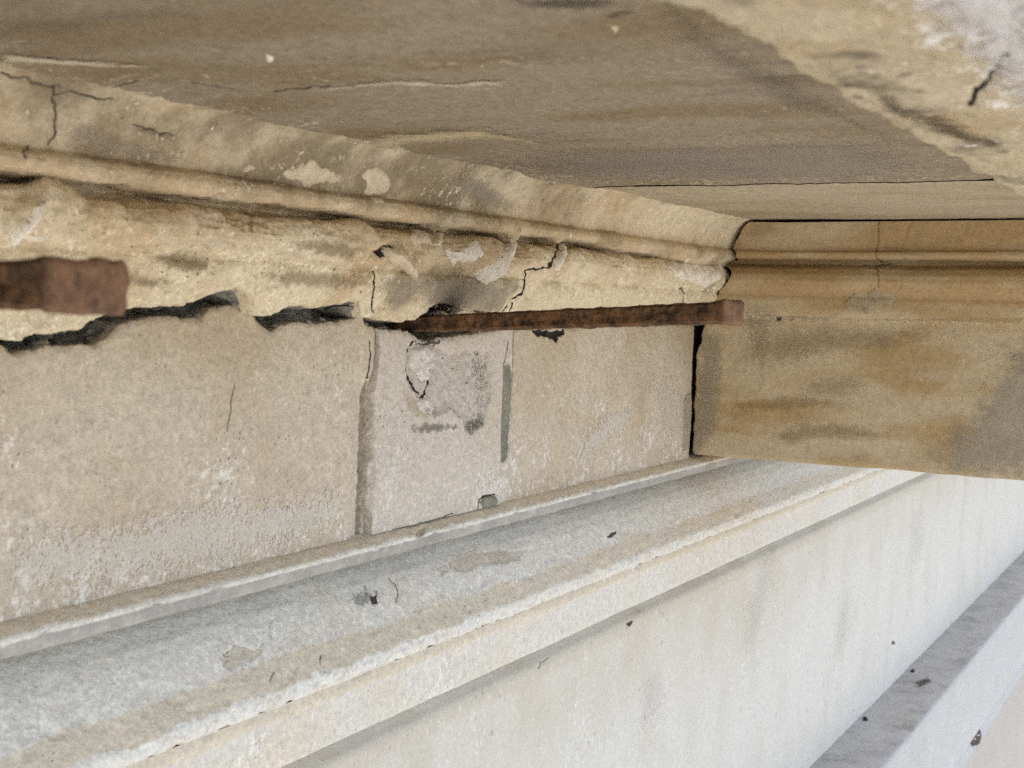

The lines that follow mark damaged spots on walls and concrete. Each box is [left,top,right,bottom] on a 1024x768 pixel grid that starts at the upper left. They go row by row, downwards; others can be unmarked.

crack [1,72,139,159]
crack [274,84,330,92]
crack [967,7,1021,106]
peeling [283,160,341,188]
peeling [362,167,391,204]
crack [502,244,559,312]
crack [0,271,480,379]
crack [689,325,705,456]
water stain [951,359,1024,476]